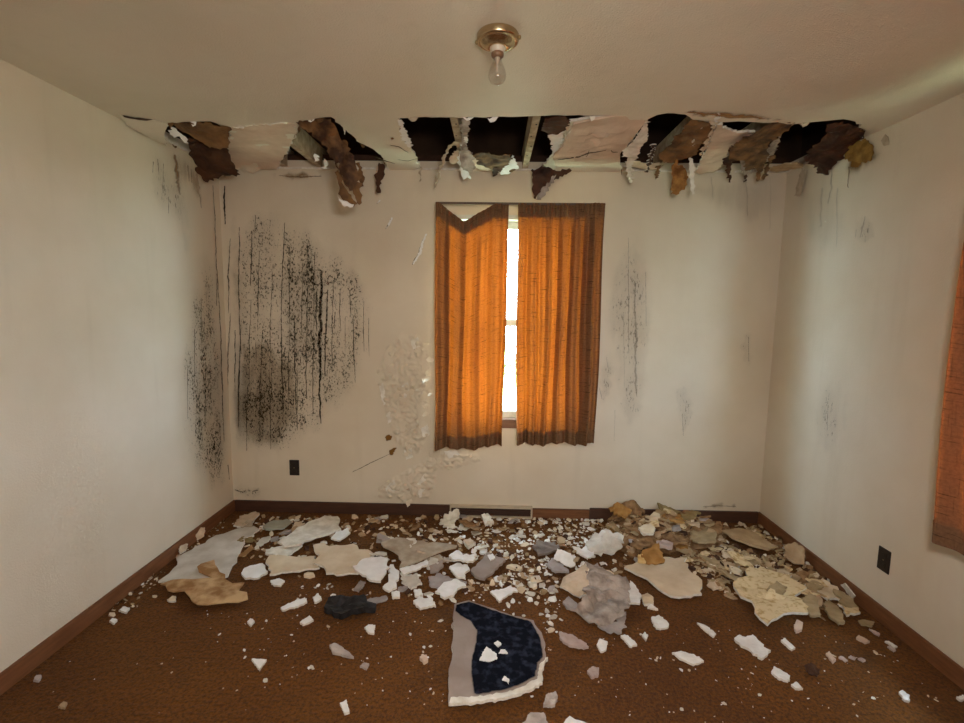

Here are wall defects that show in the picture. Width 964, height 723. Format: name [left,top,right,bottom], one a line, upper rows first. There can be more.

mould [183,186,369,482]